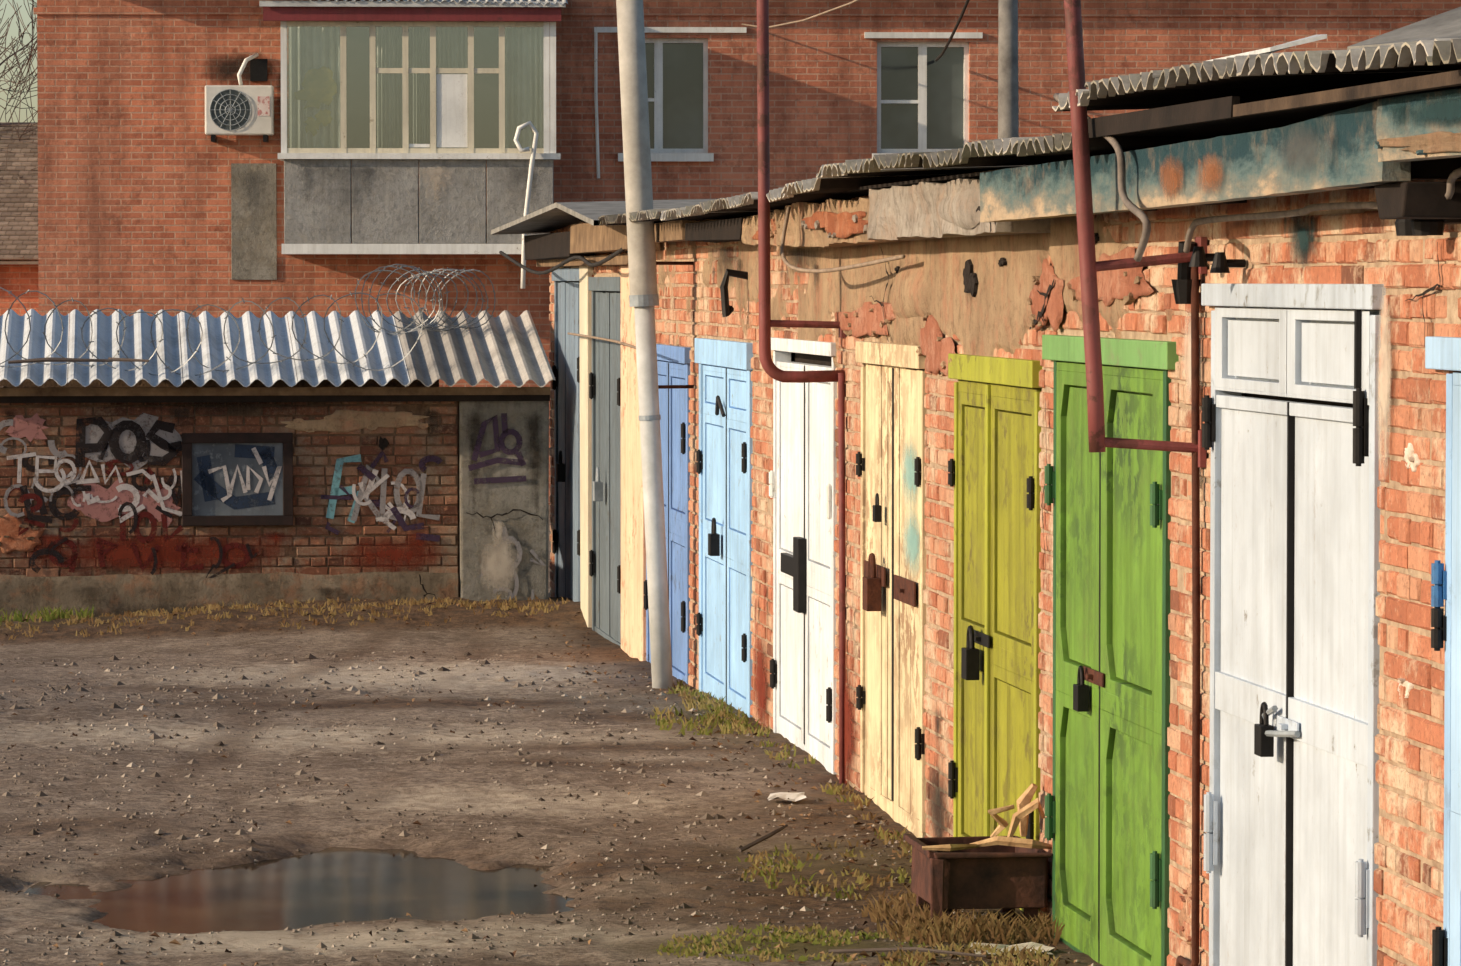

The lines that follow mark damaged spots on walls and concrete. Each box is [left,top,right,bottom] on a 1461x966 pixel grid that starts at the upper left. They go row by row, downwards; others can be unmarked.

peeling [1374,131,1461,155]
spalling [752,218,780,240]
spalling [801,211,868,239]
hole [963,259,978,297]
flaking render [1026,233,1154,332]
flaking render [835,301,896,338]
flaking render [916,312,956,376]